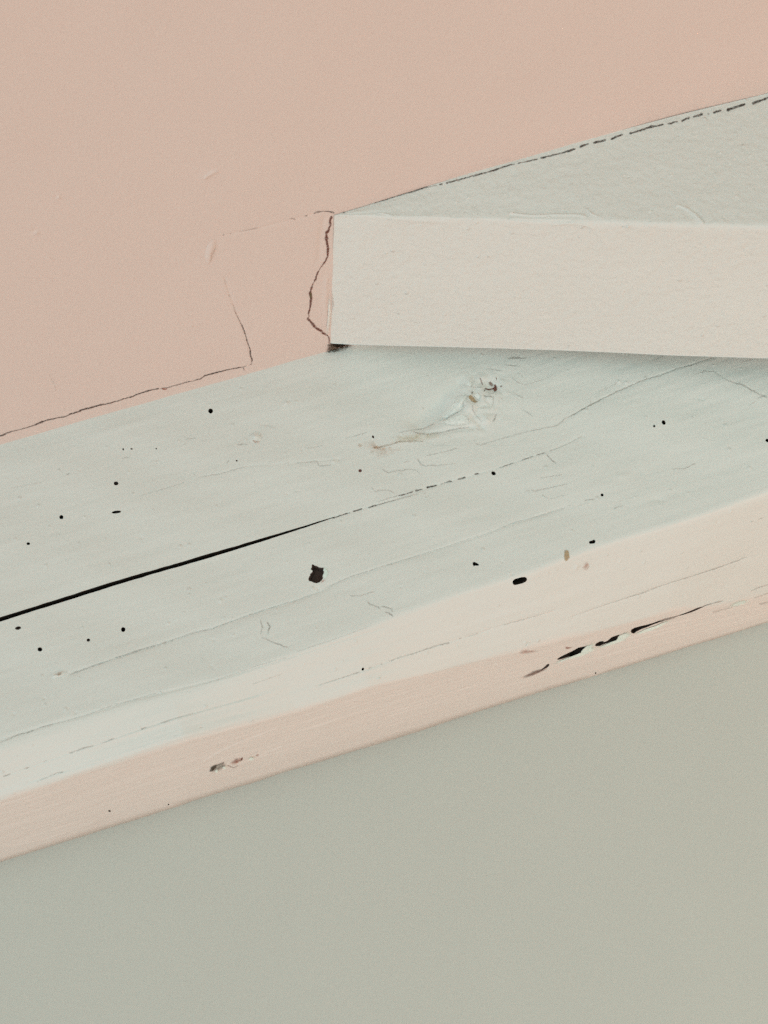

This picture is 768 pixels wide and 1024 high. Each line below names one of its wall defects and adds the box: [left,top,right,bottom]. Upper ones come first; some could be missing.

crack [375,97,768,203]
crack [307,211,332,341]
spalling [308,564,328,583]
spalling [525,604,710,677]